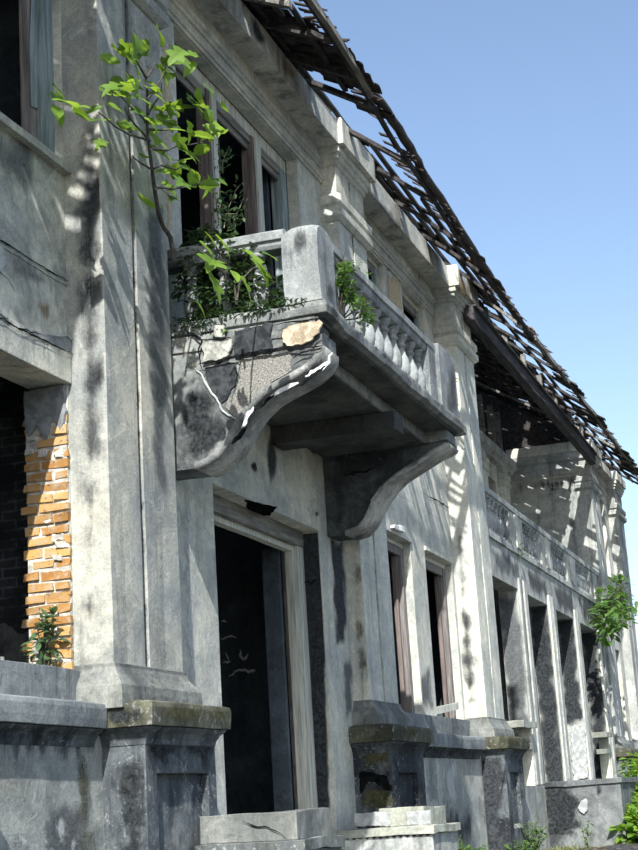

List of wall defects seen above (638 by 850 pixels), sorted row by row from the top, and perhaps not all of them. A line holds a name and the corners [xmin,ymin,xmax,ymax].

crack [0,240,68,286]
water stain [77,153,100,346]
crack [0,309,73,354]
water stain [85,362,101,453]
spalling [185,320,332,444]
water stain [462,611,473,688]
crack [243,821,287,839]